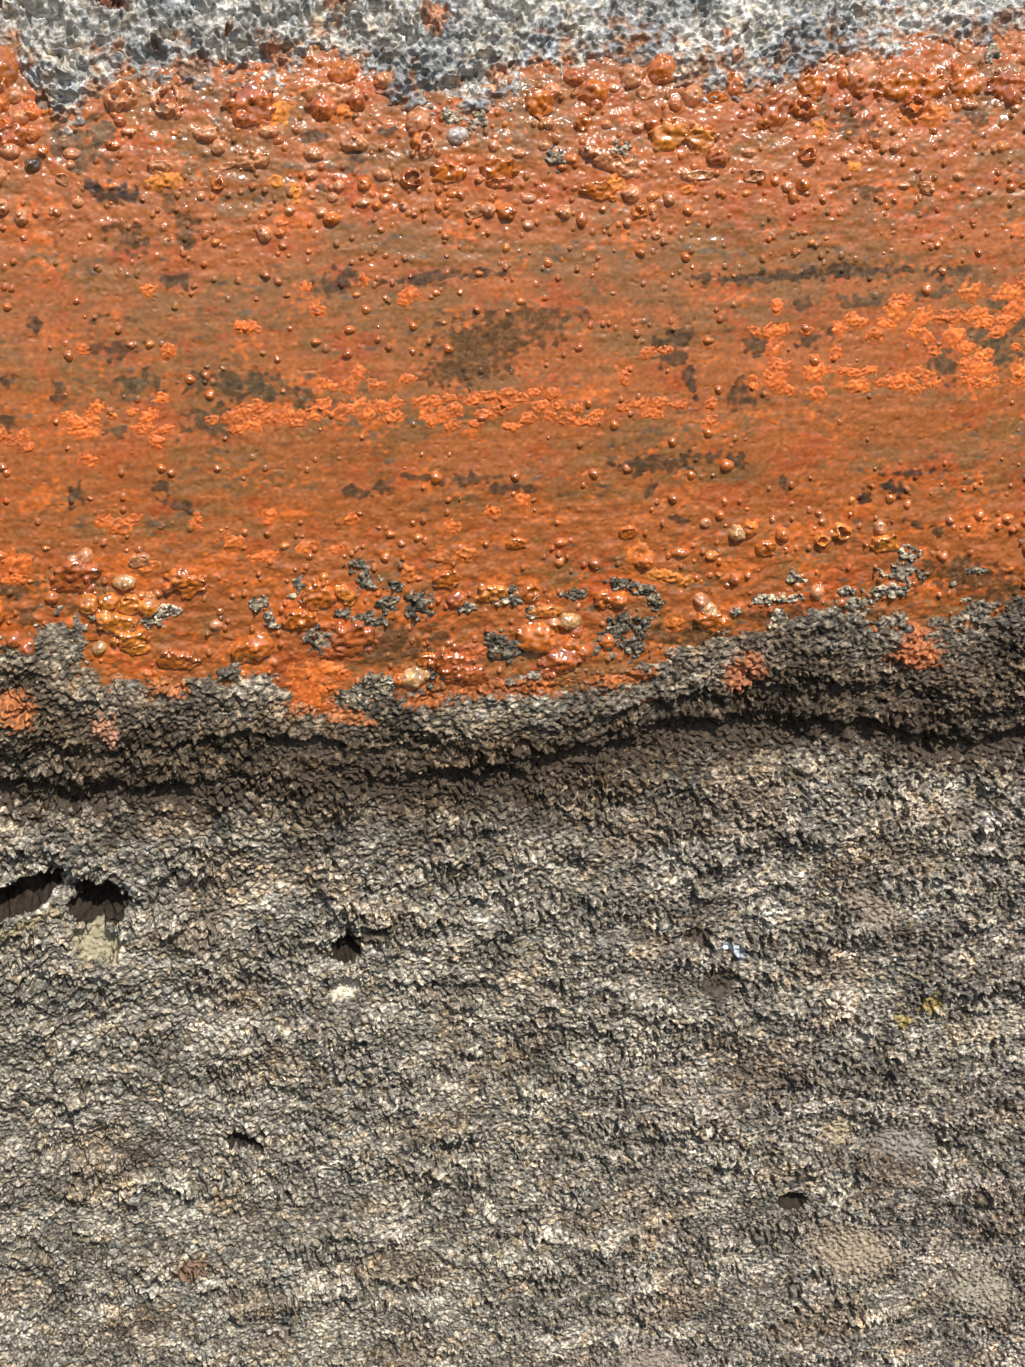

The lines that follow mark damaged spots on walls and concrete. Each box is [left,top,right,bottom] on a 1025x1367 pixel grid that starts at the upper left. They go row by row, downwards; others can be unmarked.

rust [0,46,84,226]
rust [143,26,1025,243]
rust [60,389,176,468]
rust [204,344,720,436]
rust [747,264,1025,402]
rust [813,519,900,555]
rust [0,688,38,736]
rust [0,547,208,701]
rust [89,709,119,751]
rust [228,518,660,726]
rust [618,525,771,693]
rust [883,621,955,670]